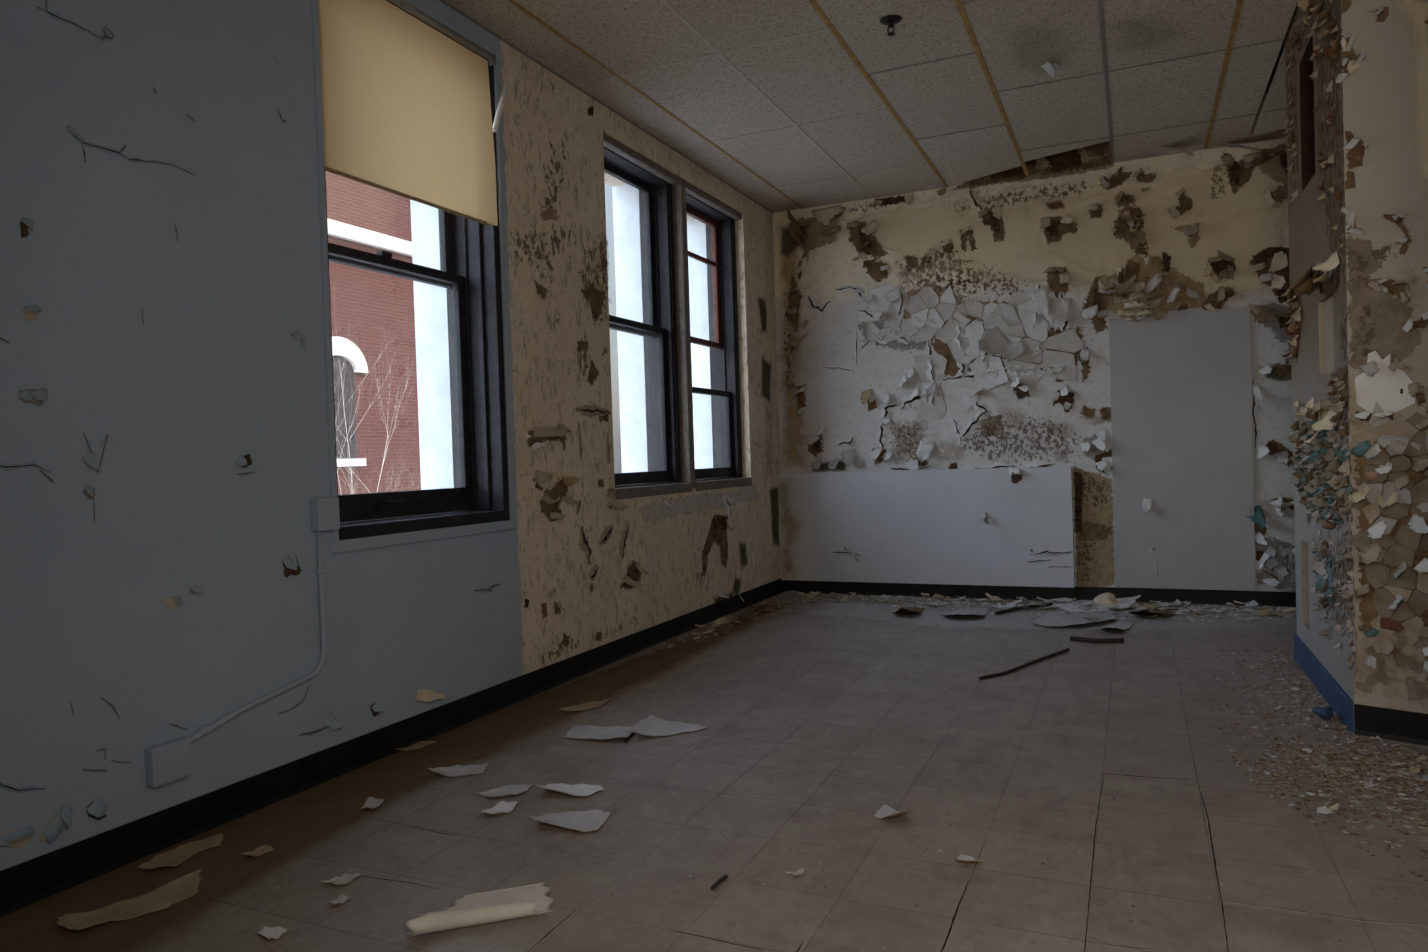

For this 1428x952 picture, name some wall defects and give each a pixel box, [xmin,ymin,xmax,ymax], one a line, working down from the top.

crack [37,0,114,41]
crack [65,124,195,175]
spalling [506,134,611,388]
spalling [785,0,1428,709]
peeling [525,424,571,451]
peeling [0,461,54,483]
peeling [533,470,580,522]
spalling [696,514,734,585]
peeling [760,590,897,604]
crack [0,778,46,794]